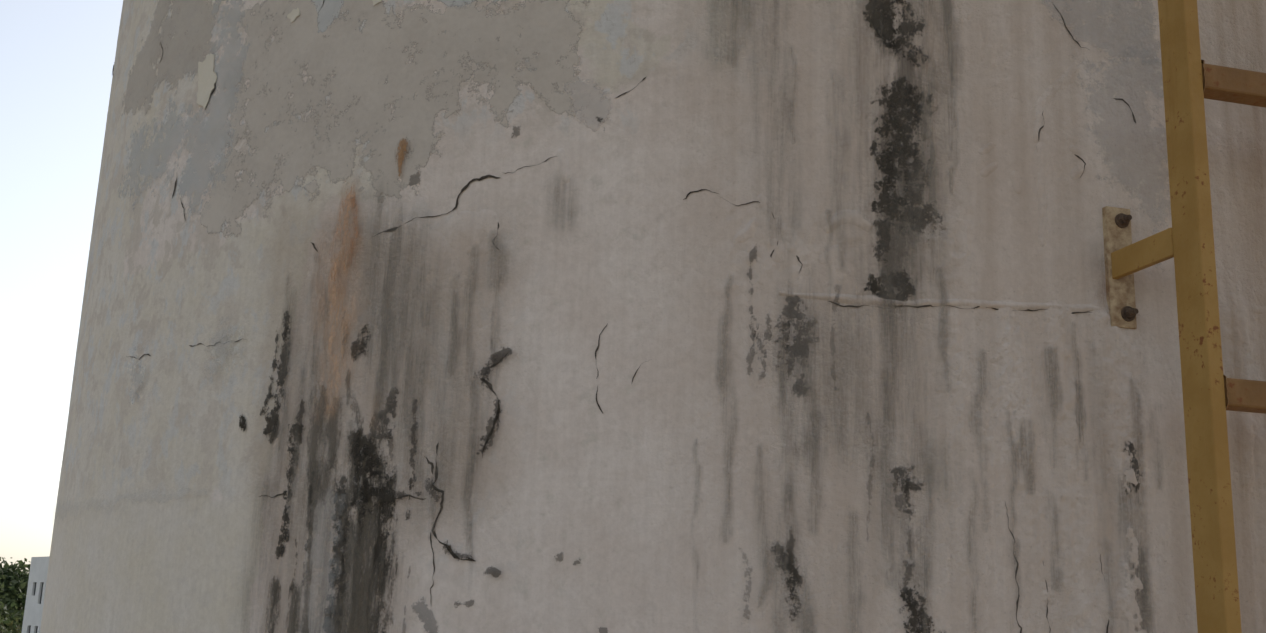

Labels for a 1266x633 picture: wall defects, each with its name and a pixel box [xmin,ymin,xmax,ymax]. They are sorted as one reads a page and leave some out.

water stain [863,0,929,67]
peeling [122,0,589,237]
rust [398,139,408,176]
crack [371,156,556,238]
water stain [864,76,943,307]
water stain [774,296,818,398]
crack [474,347,512,457]
water stain [260,310,425,633]
crack [371,443,501,594]
mould [891,465,924,494]
water stain [761,530,813,633]
mould [900,561,942,633]